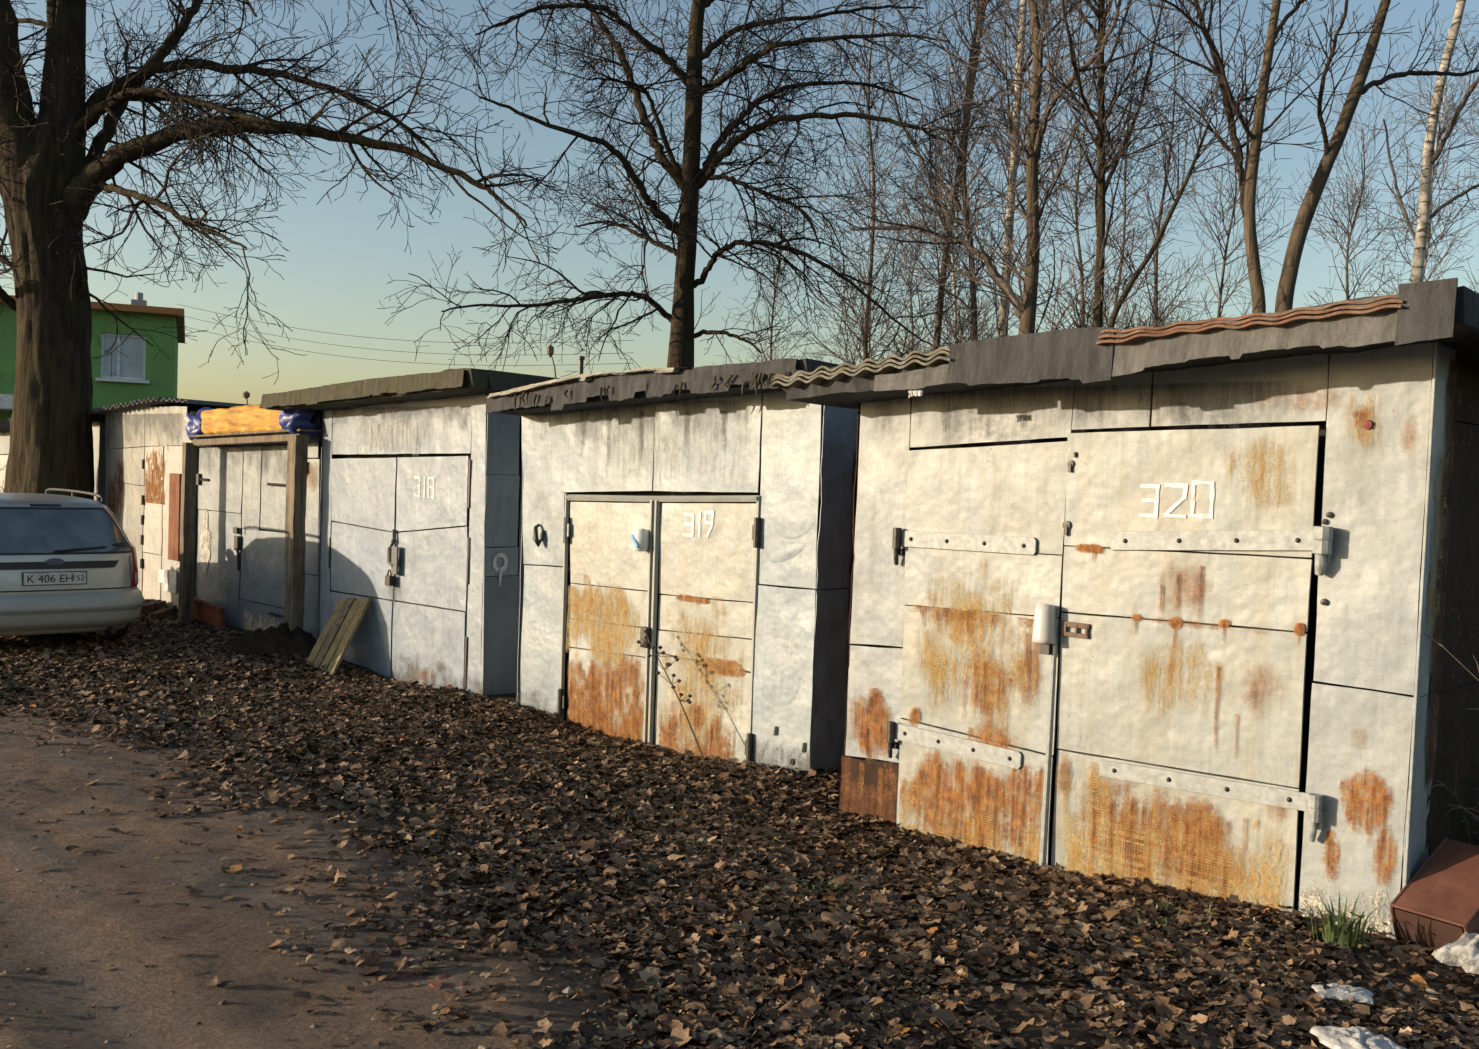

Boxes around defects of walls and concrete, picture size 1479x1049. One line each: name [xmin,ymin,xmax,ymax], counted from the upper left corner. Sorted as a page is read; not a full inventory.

rust [145,445,165,504]
rust [566,575,745,760]
rust [848,455,856,613]
rust [910,563,1039,749]
rust [1075,544,1103,557]
rust [1143,566,1222,730]
rust [1228,443,1286,506]
rust [1346,399,1377,445]
rust [1427,359,1458,788]
rust [840,642,1285,913]
rust [1323,830,1340,878]
rust [1339,770,1397,885]